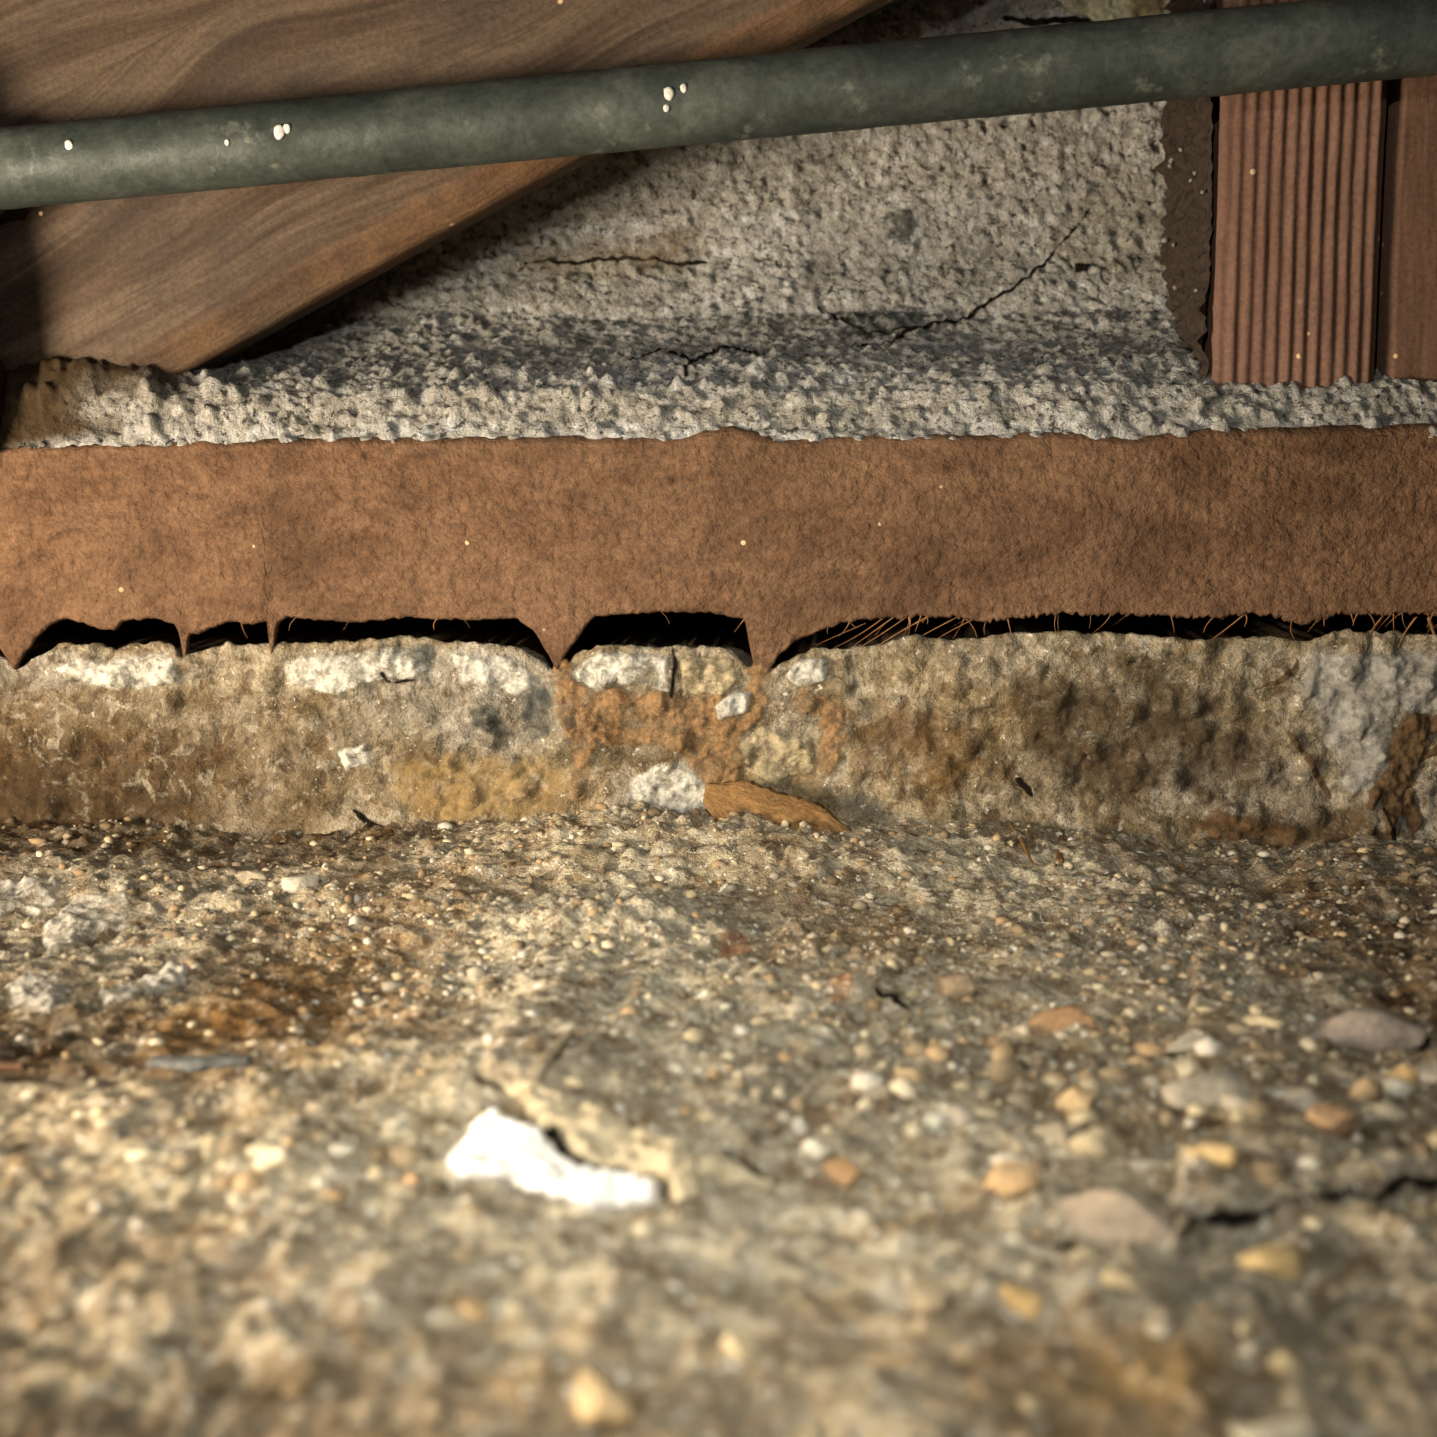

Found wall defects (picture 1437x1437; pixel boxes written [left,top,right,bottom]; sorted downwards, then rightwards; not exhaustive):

crack [524,256,707,267]
crack [817,208,1090,347]
crack [630,345,759,376]
crack [449,1060,700,1215]
crack [708,1147,779,1180]
crack [1175,1173,1437,1238]
crack [1026,1232,1077,1249]